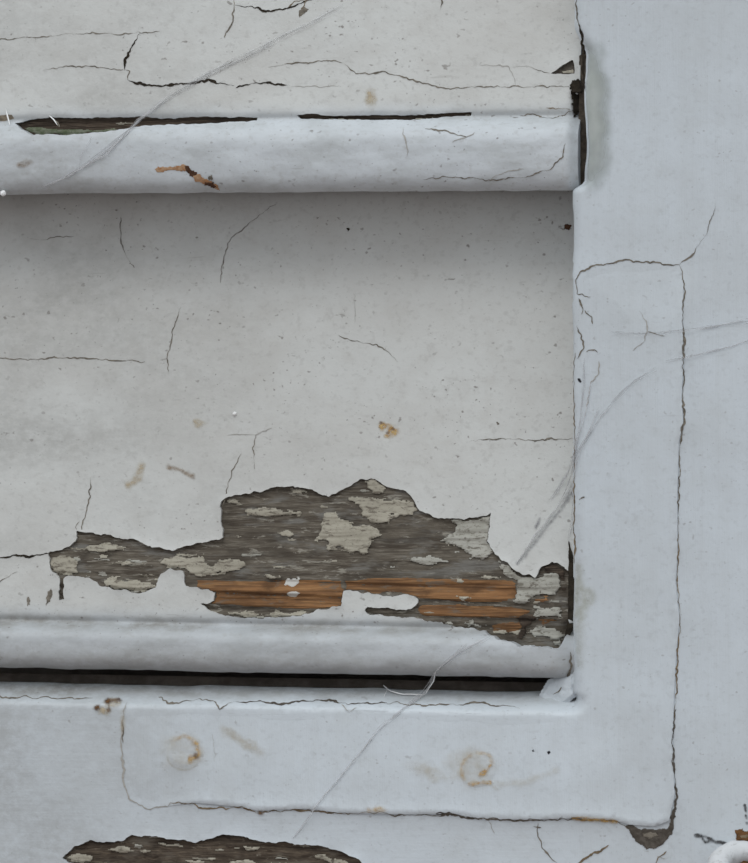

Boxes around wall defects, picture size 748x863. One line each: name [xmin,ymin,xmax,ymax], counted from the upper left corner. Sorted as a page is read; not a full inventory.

crack [0,0,586,118]
peeling [155,164,220,191]
crack [2,312,179,372]
crack [473,210,715,823]
peeling [46,478,568,648]
crack [0,693,86,701]
crack [159,697,517,712]
crack [120,703,628,863]
peeling [63,834,361,863]